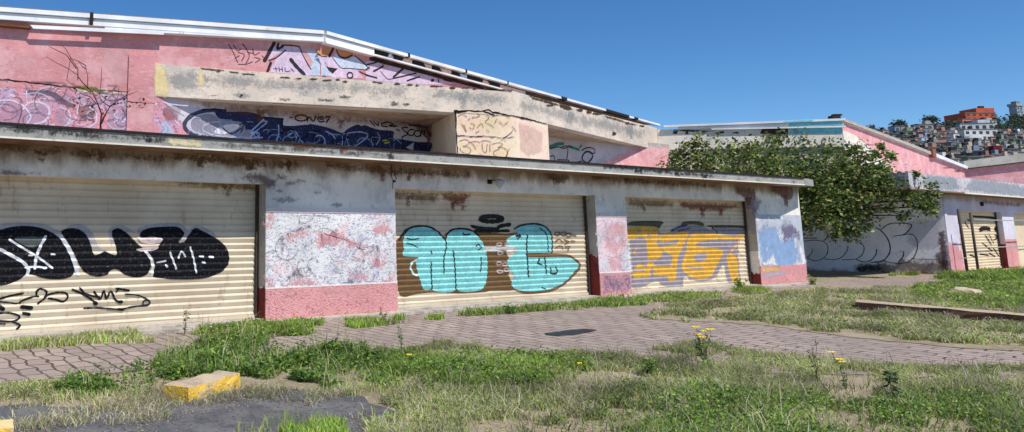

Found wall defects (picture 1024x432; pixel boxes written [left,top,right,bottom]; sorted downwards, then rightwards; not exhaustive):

leakage [0,126,470,181]
rust [395,190,468,210]
rust [681,186,756,216]
peeling [265,267,315,296]
peeling [279,222,393,293]
peeling [756,214,806,277]